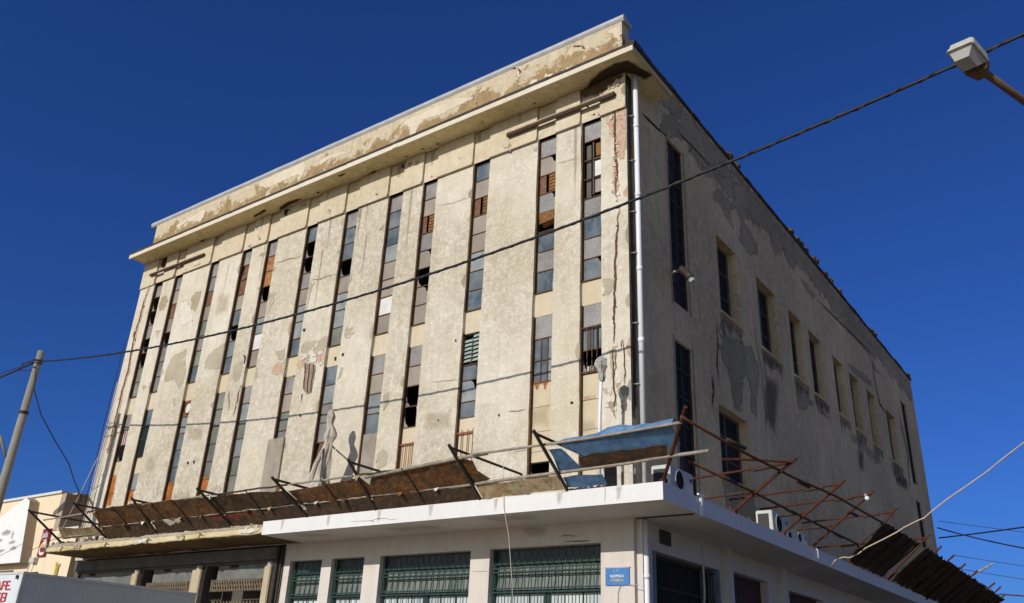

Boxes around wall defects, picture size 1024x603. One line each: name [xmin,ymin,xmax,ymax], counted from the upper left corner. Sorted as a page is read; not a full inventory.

peeling [605,26,622,47]
peeling [401,97,473,135]
spalling [591,108,627,197]
crack [611,109,709,416]
peeling [660,92,913,400]
peeling [159,291,201,326]
peeling [161,349,187,406]
spalling [271,336,327,412]
peeling [719,322,780,416]